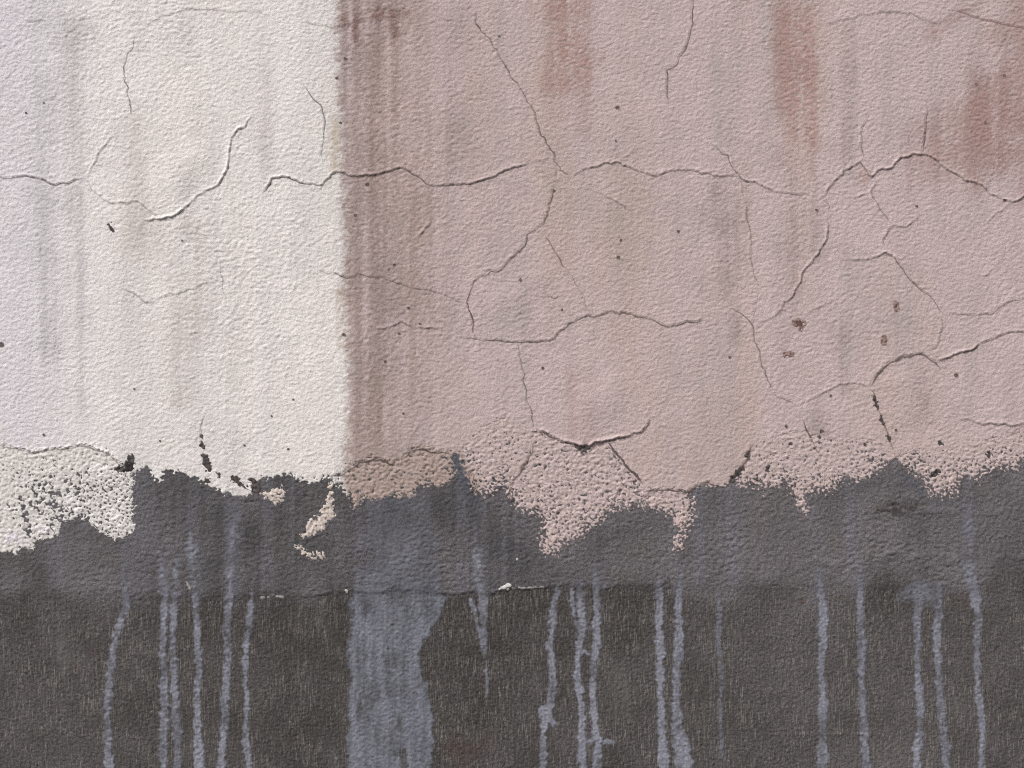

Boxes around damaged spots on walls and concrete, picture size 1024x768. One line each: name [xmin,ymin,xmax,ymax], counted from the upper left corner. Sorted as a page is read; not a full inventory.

crack [263,166,523,192]
crack [457,127,701,343]
crack [873,301,1012,402]
spalling [0,433,137,555]
spalling [199,434,261,493]
spalling [327,395,1024,558]
crack [609,420,751,493]
damp [158,532,254,768]
damp [346,581,445,768]
damp [538,573,615,768]
damp [654,570,694,768]
damp [903,583,950,768]